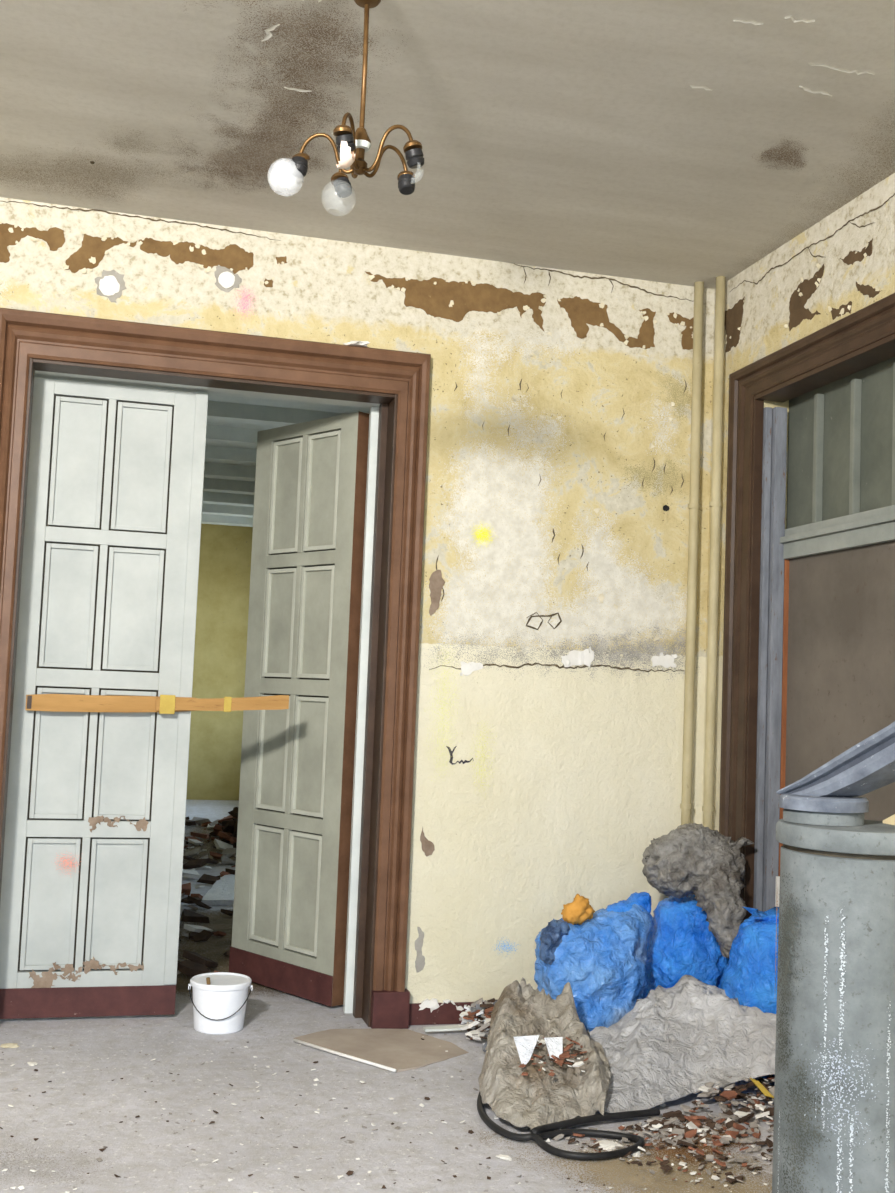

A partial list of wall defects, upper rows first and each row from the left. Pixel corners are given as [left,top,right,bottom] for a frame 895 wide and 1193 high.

water stain [0,0,409,208]
peeling [0,222,254,274]
peeling [259,256,287,287]
peeling [724,296,745,354]
crack [730,193,895,292]
peeling [784,263,882,331]
peeling [840,238,873,265]
flaking render [365,271,703,676]
peeling [88,815,149,833]
peeling [29,956,144,988]